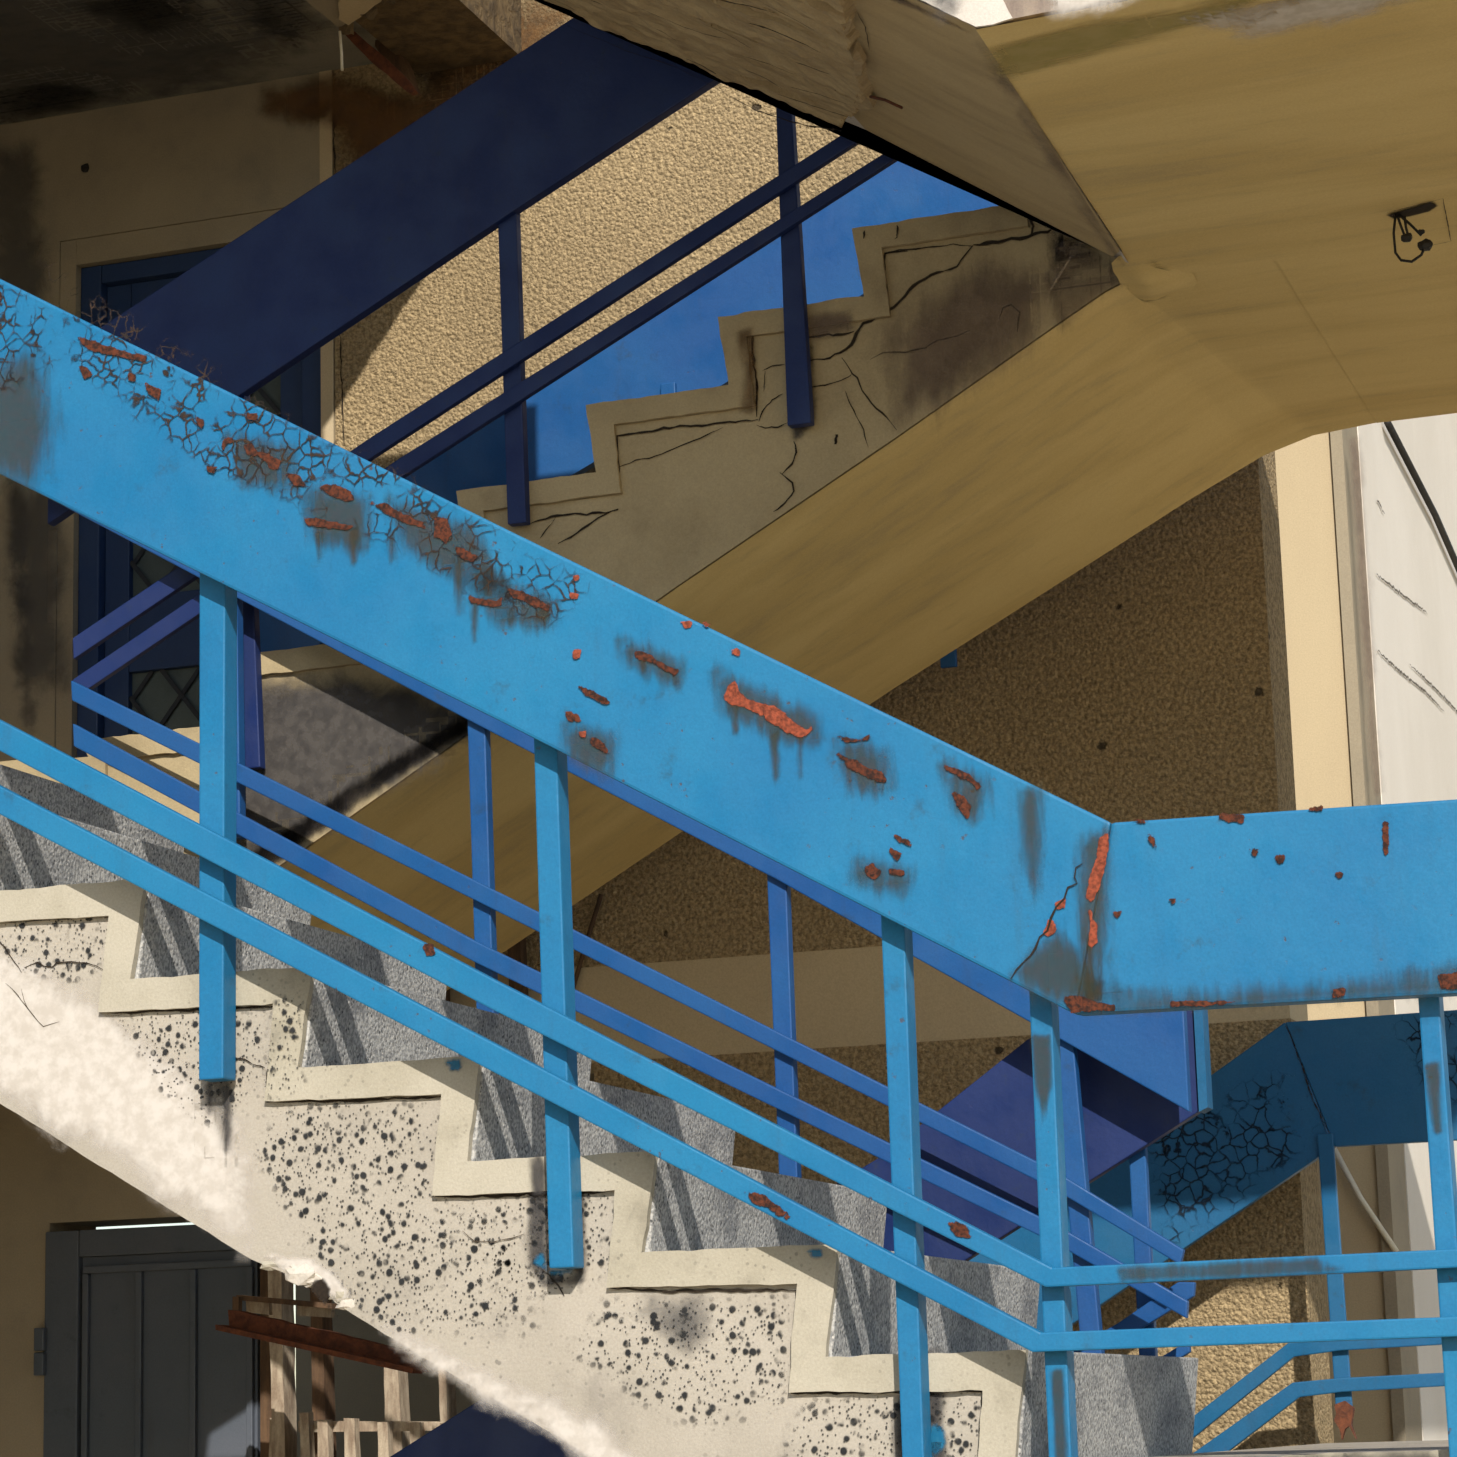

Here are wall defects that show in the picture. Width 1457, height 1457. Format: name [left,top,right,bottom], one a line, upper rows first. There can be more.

leakage [1054,0,1113,12]
leakage [0,152,42,296]
rust [78,337,161,400]
crack [616,219,1052,512]
leakage [12,480,60,677]
rust [207,437,550,629]
rust [724,681,817,775]
crack [1011,864,1082,978]
rust [1023,834,1125,1013]
leakage [0,917,630,1457]
crack [1154,1026,1326,1242]
crack [1406,1015,1457,1100]